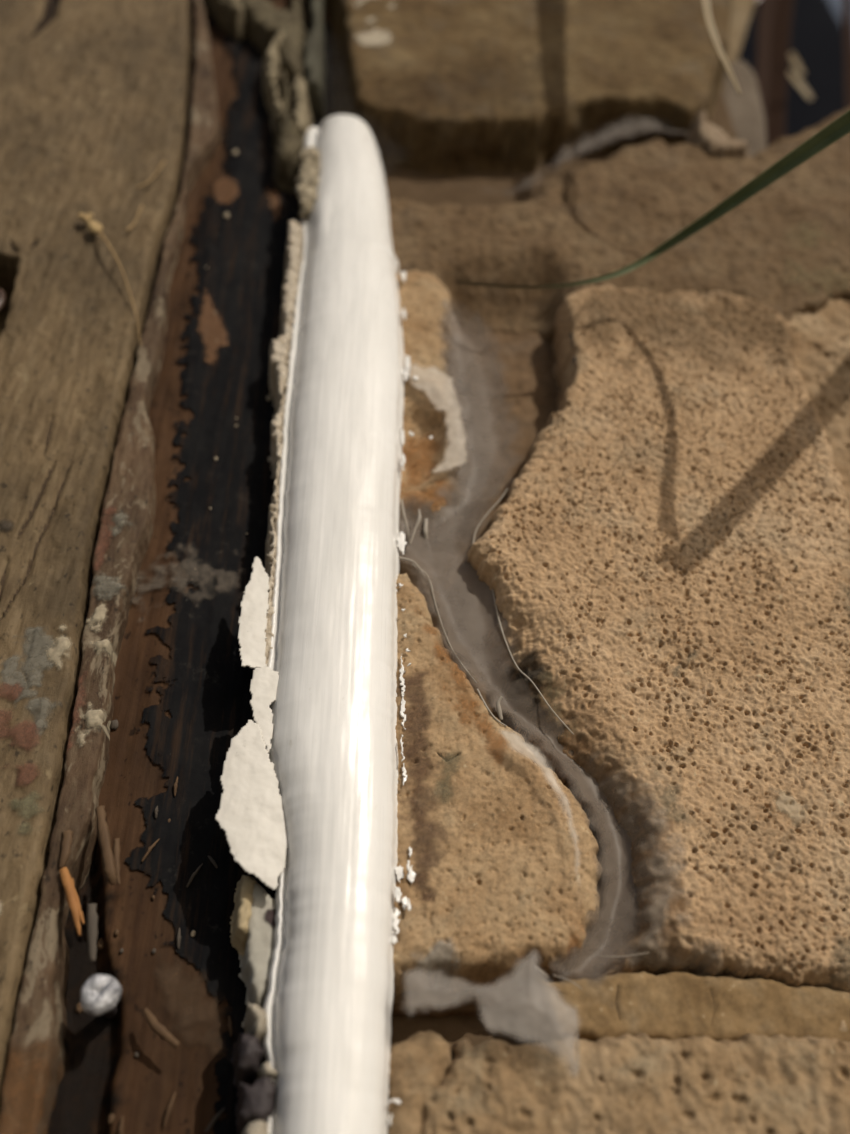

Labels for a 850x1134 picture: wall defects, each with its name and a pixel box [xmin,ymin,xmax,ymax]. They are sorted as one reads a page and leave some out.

peeling [312,22,336,128]
peeling [125,18,301,1134]
damp [399,673,440,900]
damp [505,651,546,717]